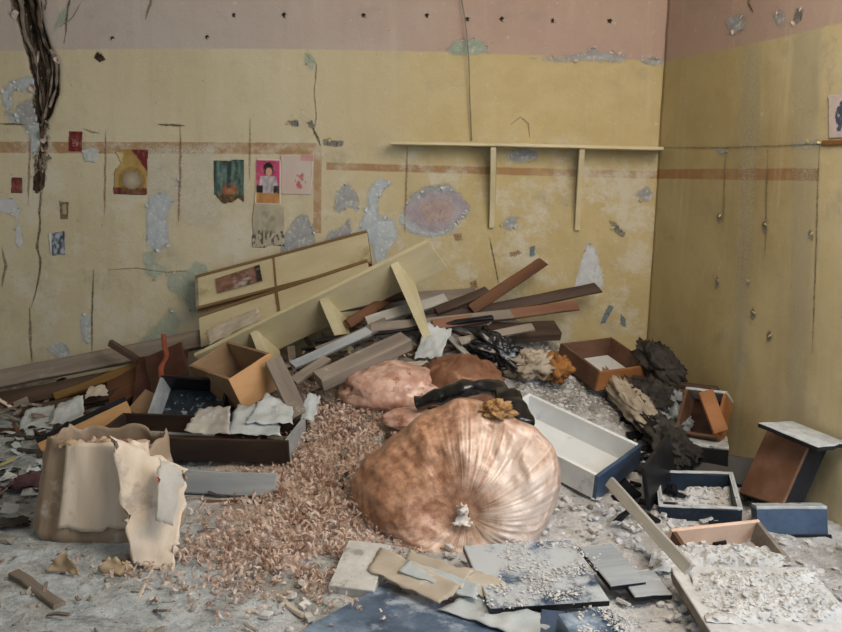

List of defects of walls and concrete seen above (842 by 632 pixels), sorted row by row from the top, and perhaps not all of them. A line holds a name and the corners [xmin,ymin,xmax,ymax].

peeling [531,44,663,67]
peeling [0,75,42,155]
crack [2,0,79,360]
crack [0,250,8,287]
peeling [142,191,209,313]
flaking render [280,178,472,264]
peeling [574,242,605,287]